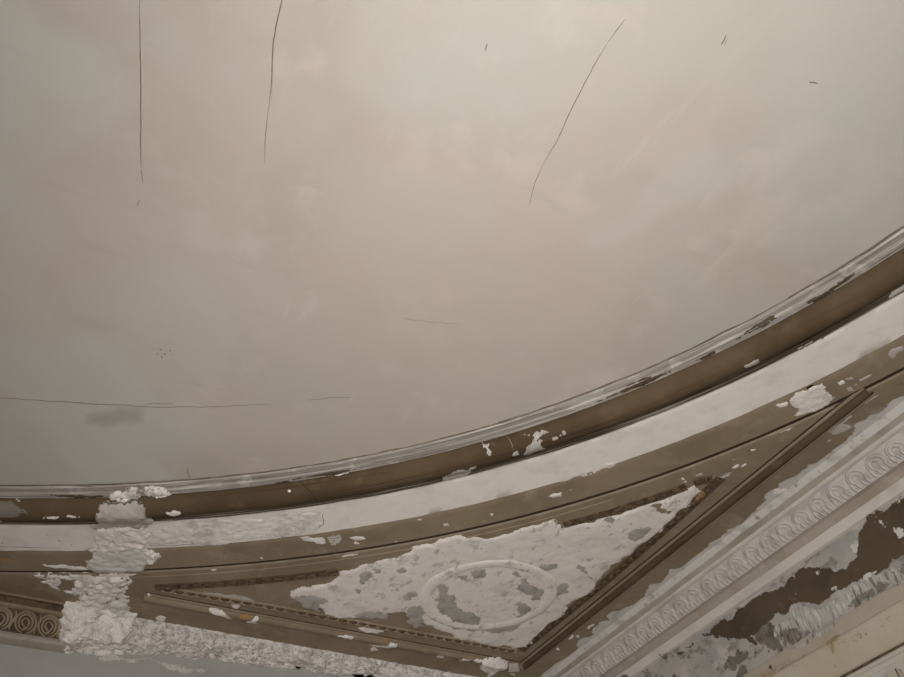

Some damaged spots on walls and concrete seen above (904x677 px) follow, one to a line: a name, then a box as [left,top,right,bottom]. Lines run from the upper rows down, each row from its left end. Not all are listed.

crack [136,1,144,206]
crack [264,0,283,156]
crack [529,19,626,206]
peeling [41,578,77,595]
flaking render [106,473,703,677]
peeling [704,498,904,640]